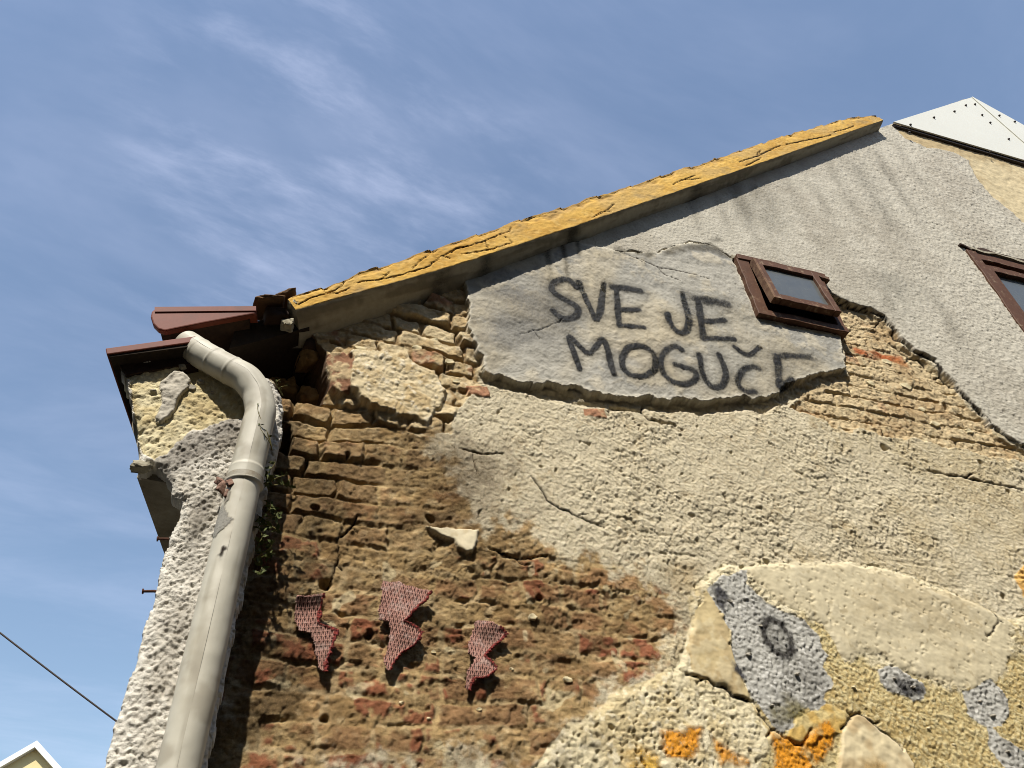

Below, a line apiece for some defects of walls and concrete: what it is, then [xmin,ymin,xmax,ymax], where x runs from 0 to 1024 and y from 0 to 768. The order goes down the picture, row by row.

spalling [124,362,245,474]
spalling [208,282,677,768]
crack [531,477,601,527]
spalling [790,293,1024,462]
flaking render [686,561,1024,768]